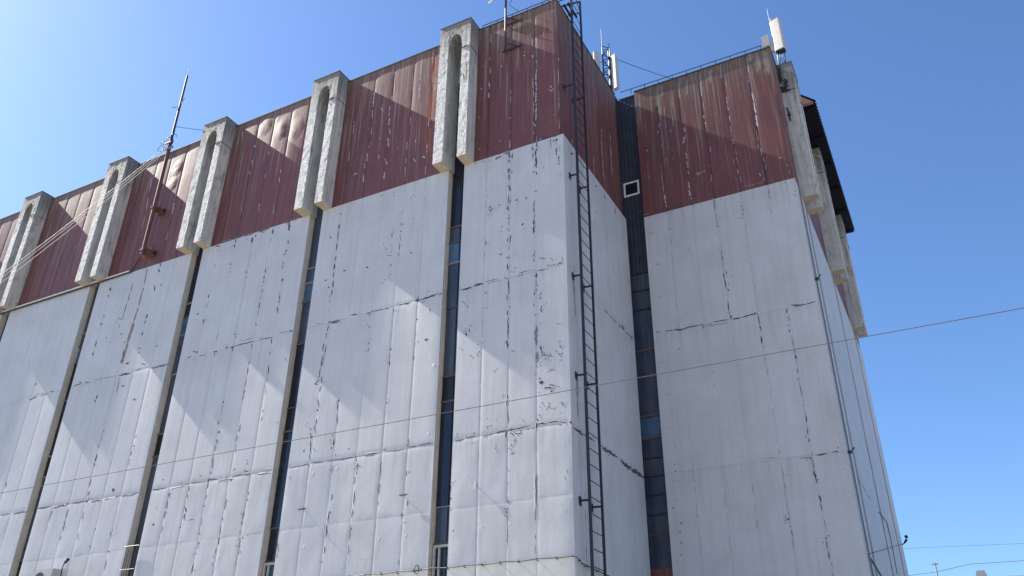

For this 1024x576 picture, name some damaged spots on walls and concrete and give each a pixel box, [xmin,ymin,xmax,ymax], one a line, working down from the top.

rust [428,52,437,153]
crack [604,199,763,344]
crack [1,139,644,573]
peeling [534,325,564,419]